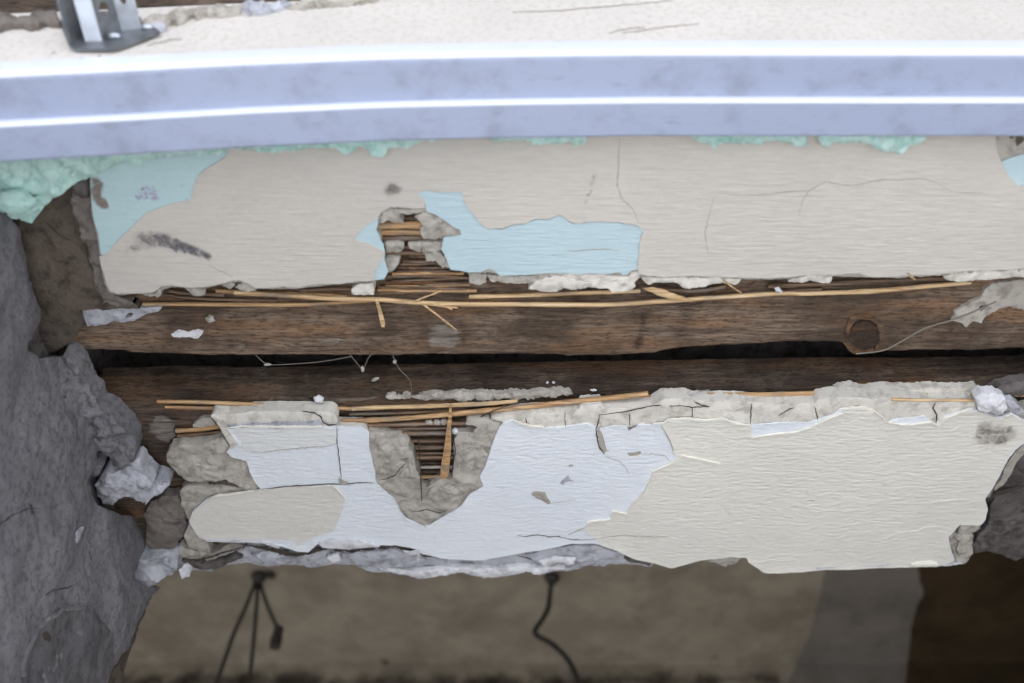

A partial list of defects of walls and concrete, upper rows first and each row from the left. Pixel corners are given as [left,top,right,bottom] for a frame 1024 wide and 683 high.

flaking render [1002,136,1024,187]
flaking render [355,190,643,280]
crack [705,178,985,251]
flaking render [987,373,1024,397]
flaking render [144,386,1024,580]
flaking render [788,442,1024,683]